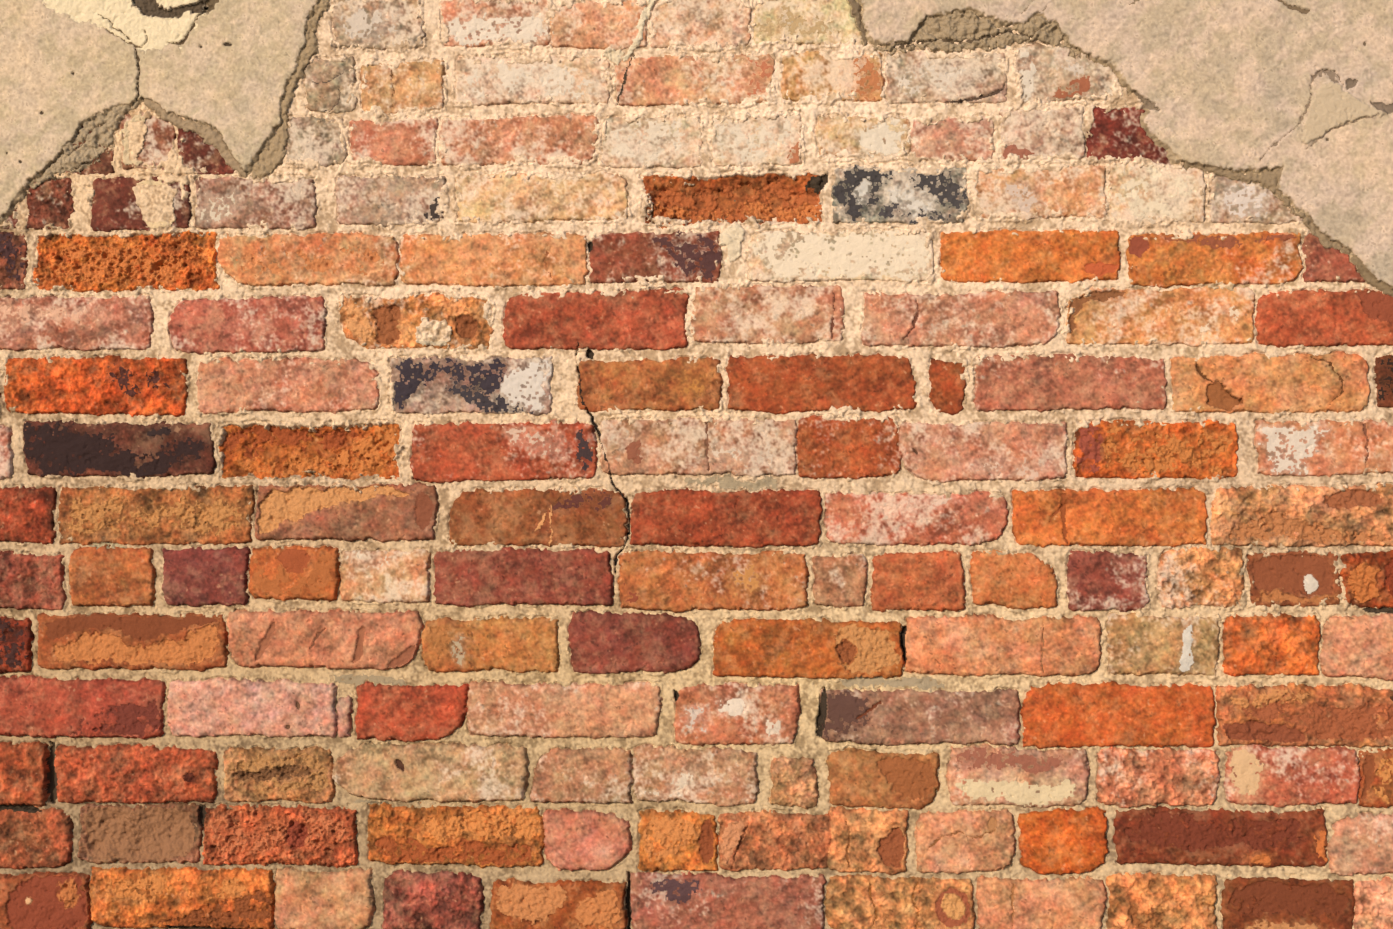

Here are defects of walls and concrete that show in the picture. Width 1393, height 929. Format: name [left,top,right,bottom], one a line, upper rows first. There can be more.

spalling [31,0,329,189]
crack [617,55,635,105]
spalling [848,0,1089,59]
crack [1260,69,1380,161]
spalling [1068,160,1393,333]
spalling [346,304,401,345]
spalling [68,425,409,536]
crack [575,342,631,572]
spalling [1229,509,1393,604]
spalling [45,613,220,666]
spalling [82,751,346,929]
spalling [375,810,622,929]